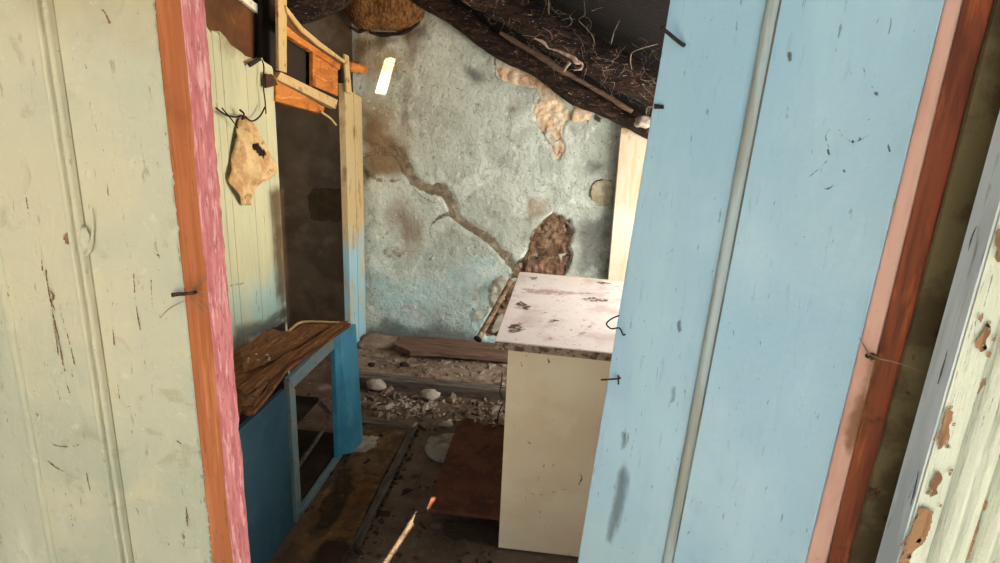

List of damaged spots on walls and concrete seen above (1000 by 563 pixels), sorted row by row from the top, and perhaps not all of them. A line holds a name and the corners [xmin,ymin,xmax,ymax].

flaking render [493,58,601,159]
crack [363,138,516,272]
flaking render [485,213,574,336]
peeling [976,315,996,358]
peeling [933,405,956,450]
peeling [899,469,953,563]
peeling [965,499,988,561]